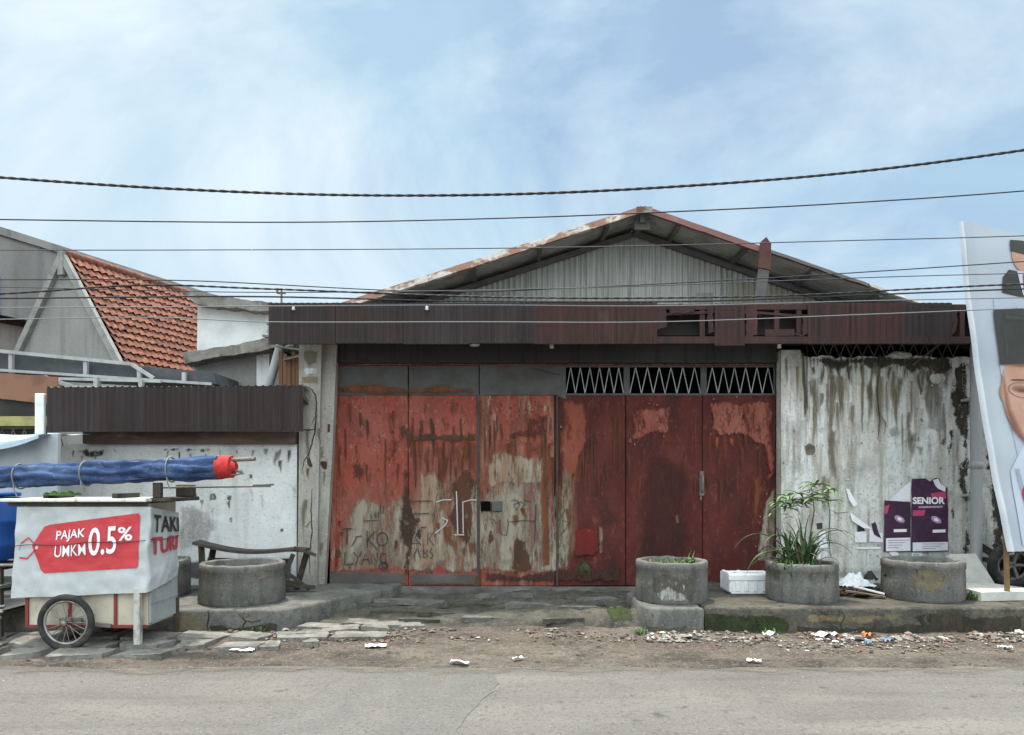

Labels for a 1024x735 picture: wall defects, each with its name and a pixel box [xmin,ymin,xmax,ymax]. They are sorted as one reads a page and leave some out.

rust [307,384,475,575]
peeling [338,443,575,575]
rust [489,413,551,571]
peeling [629,403,669,446]
water stain [785,353,970,518]